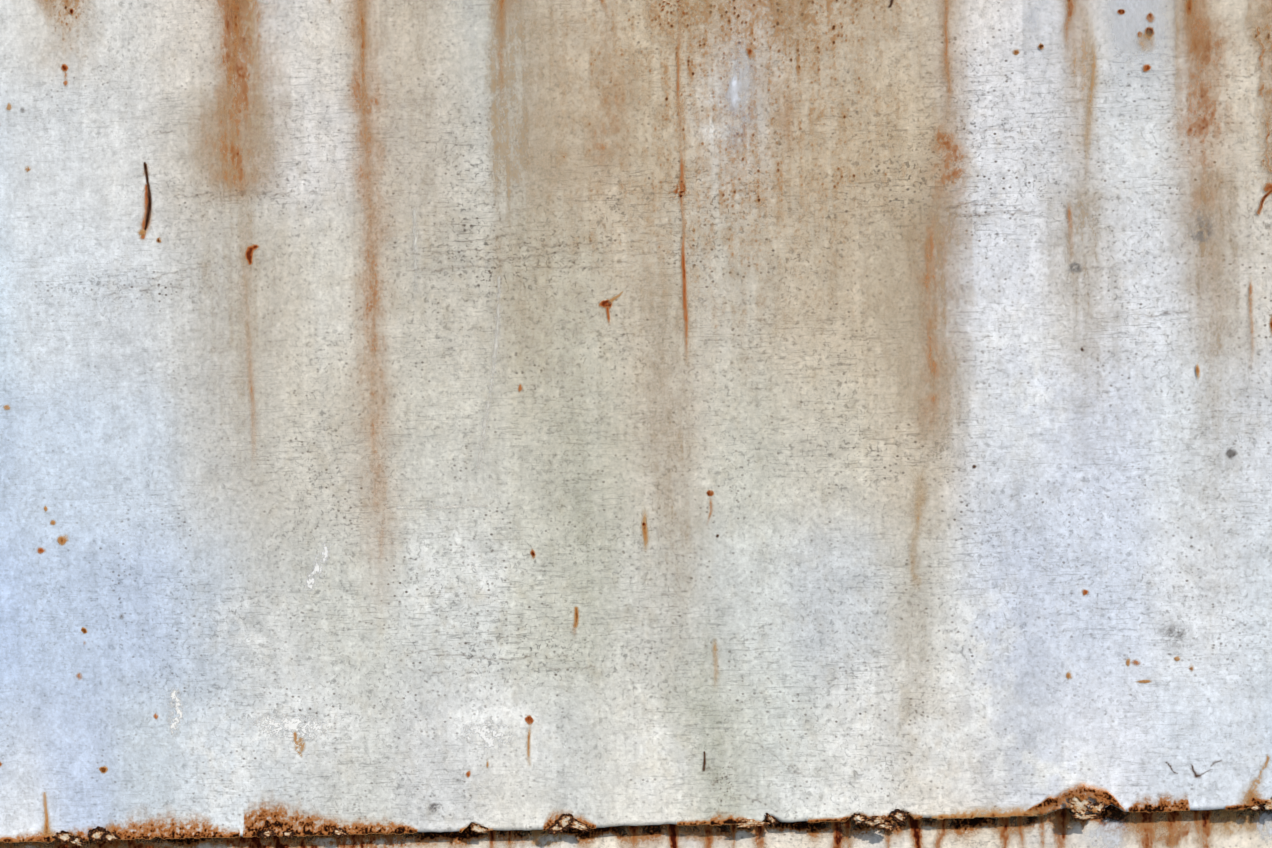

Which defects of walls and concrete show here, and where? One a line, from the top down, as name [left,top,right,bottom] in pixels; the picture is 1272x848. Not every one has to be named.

rust [46,0,83,40]
rust [214,0,260,189]
rust [1065,0,1074,36]
rust [1138,13,1154,45]
rust [1183,0,1223,165]
rust [1253,11,1272,67]
rust [352,0,379,352]
rust [590,0,900,347]
rust [935,129,963,184]
rust [1257,84,1272,214]
rust [245,245,258,265]
rust [0,756,1272,848]